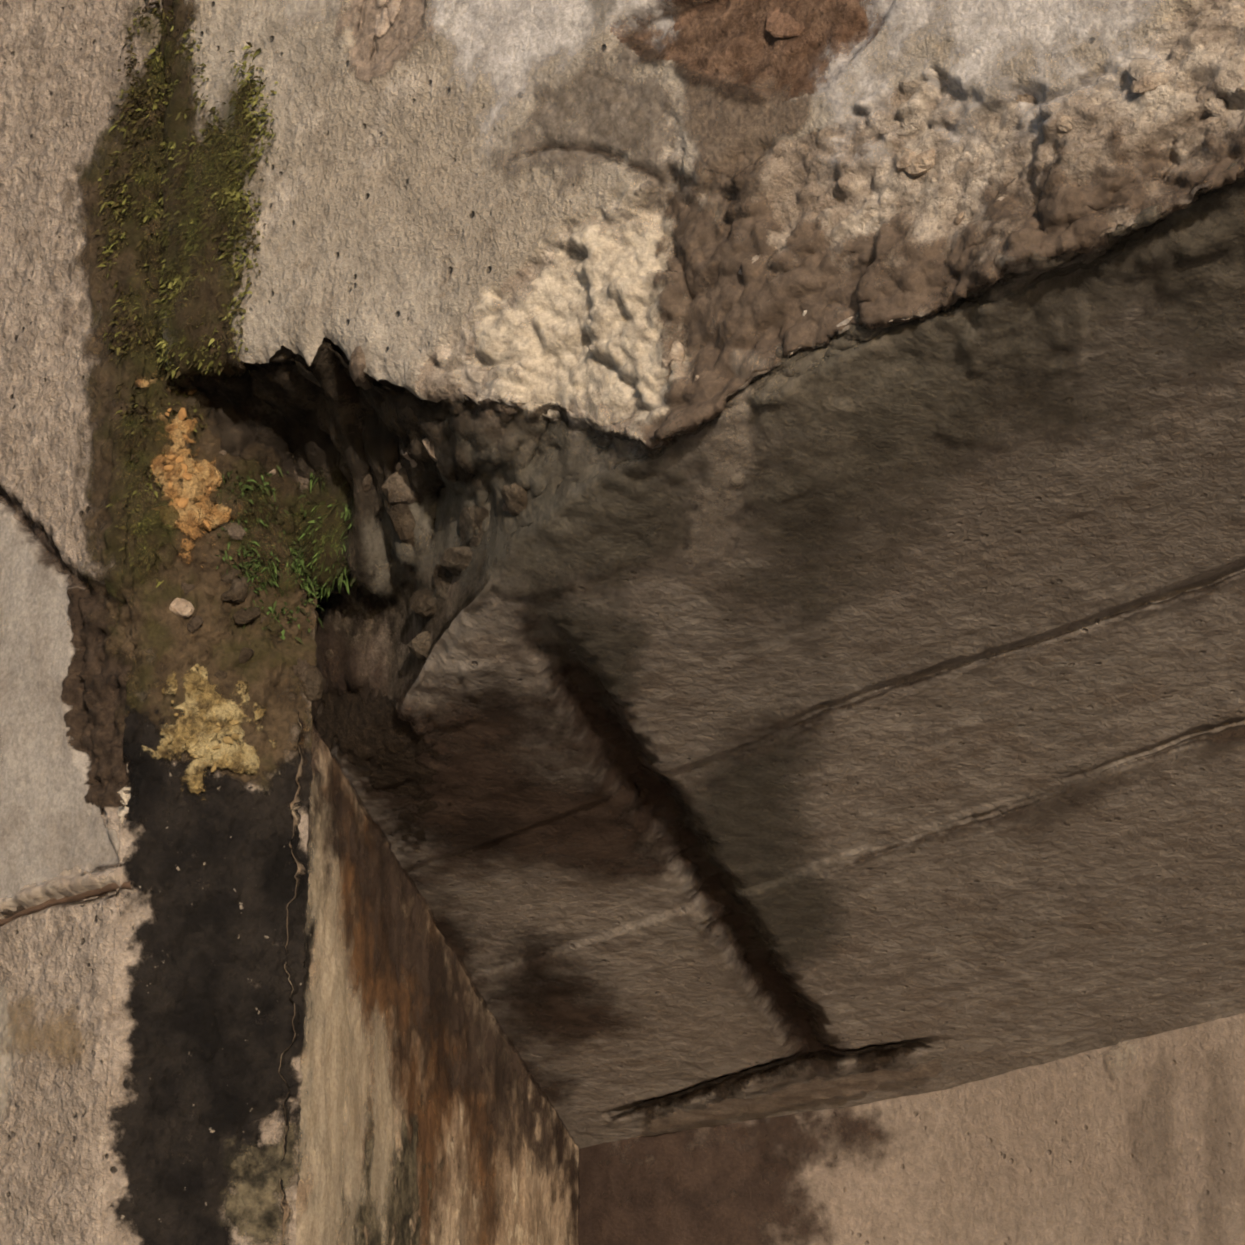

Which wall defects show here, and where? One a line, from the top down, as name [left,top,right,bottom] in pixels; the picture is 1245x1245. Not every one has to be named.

crack [143,0,175,345]
spalling [185,0,1245,749]
crack [0,485,90,589]
spalling [169,582,204,634]
crack [1122,725,1245,764]
crack [0,865,128,925]
crack [520,602,1074,1132]
damp [109,703,443,1245]
damp [535,1091,885,1245]